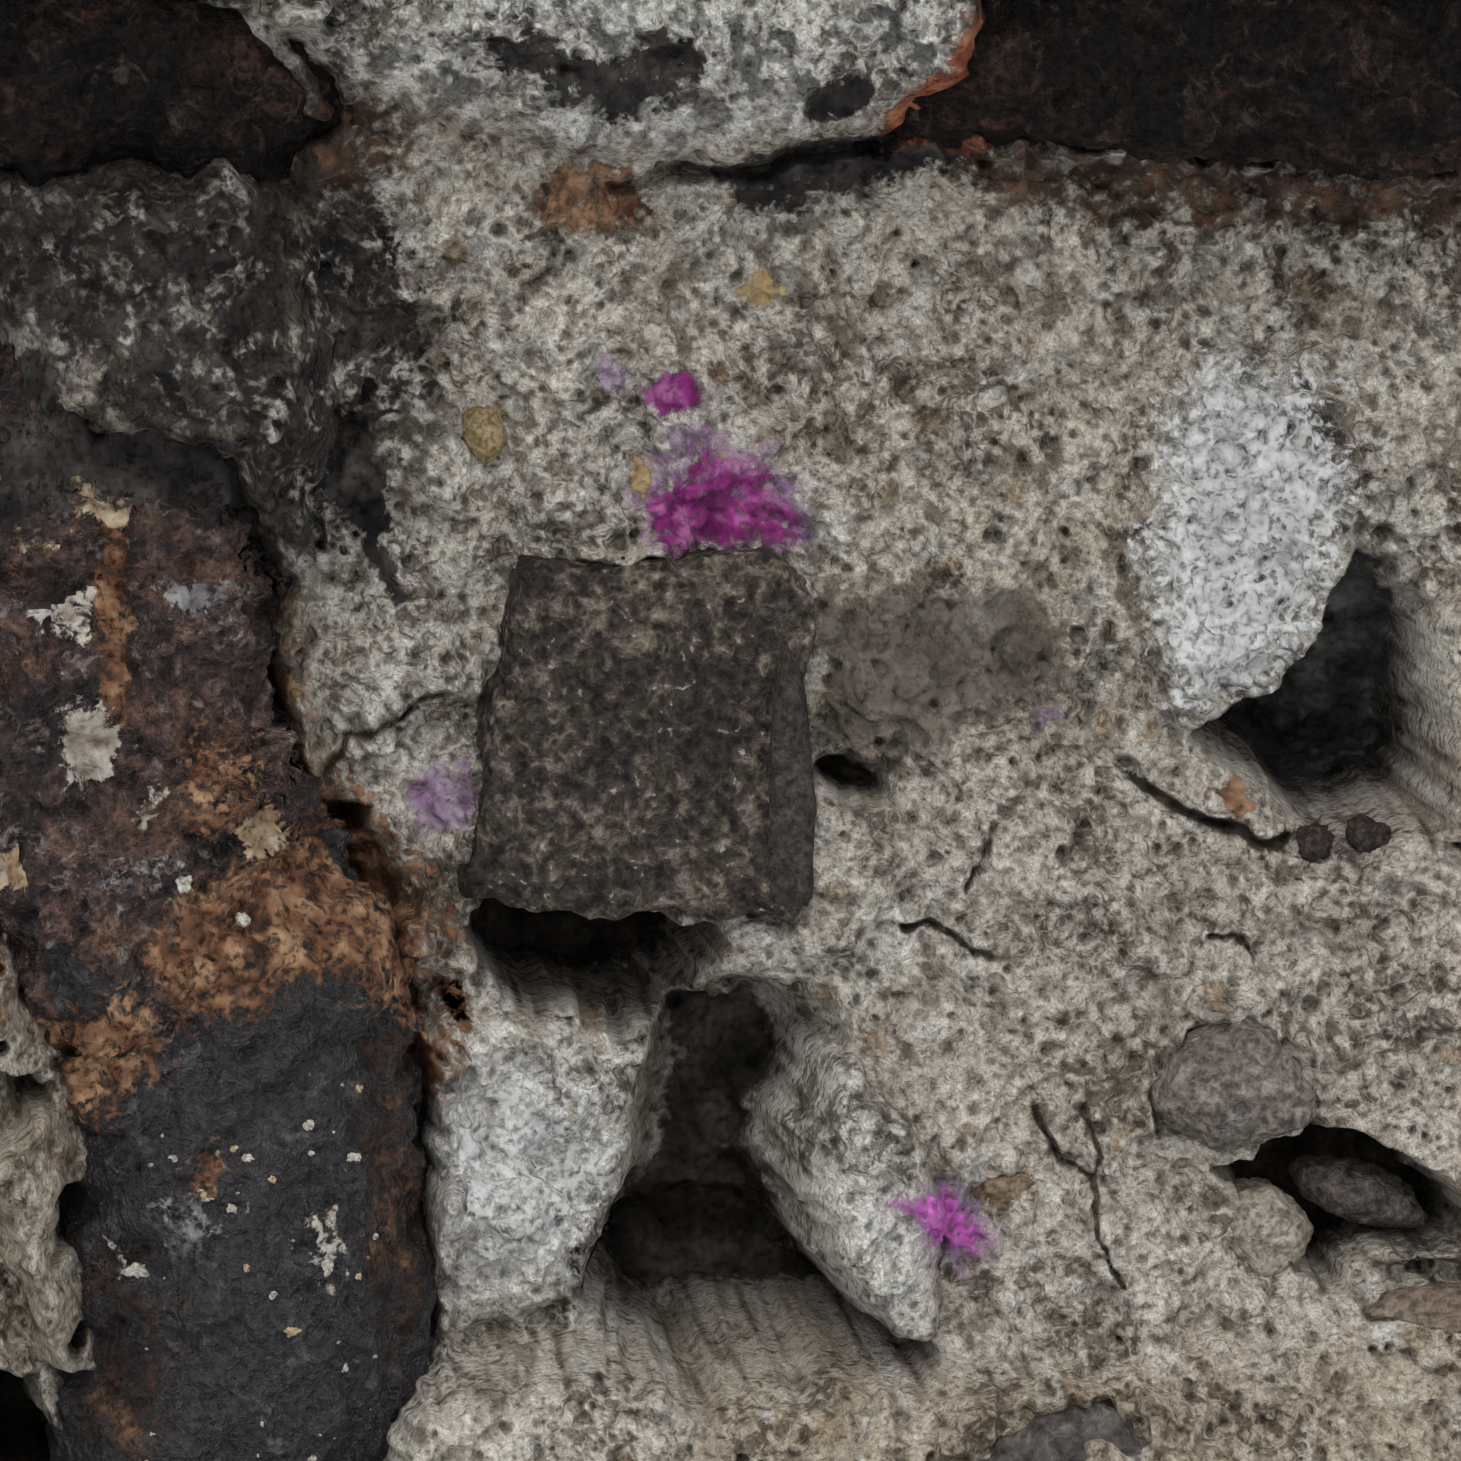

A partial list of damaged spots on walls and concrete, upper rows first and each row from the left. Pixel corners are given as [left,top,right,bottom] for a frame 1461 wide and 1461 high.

rust [881,0,1461,307]
rust [0,345,78,448]
rust [0,456,493,1368]
crack [1114,763,1293,852]
crack [1032,1105,1126,1290]
rust [71,1238,168,1461]